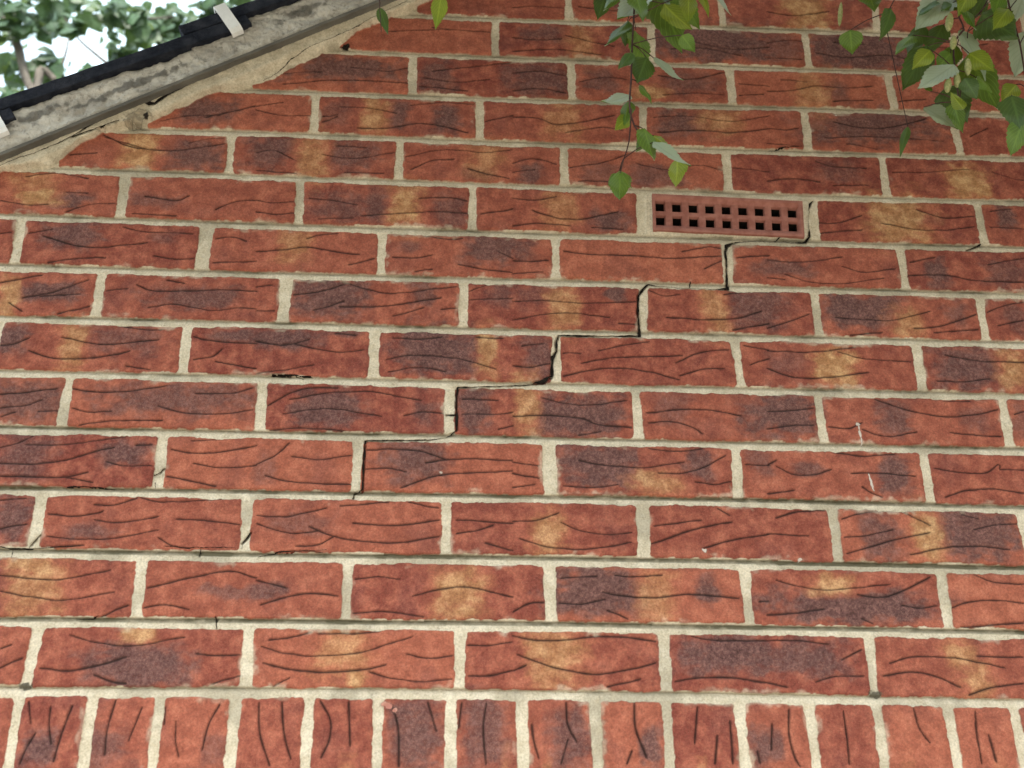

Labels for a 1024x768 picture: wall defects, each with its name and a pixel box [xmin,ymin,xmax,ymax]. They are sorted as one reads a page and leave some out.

crack [263,1,406,81]
crack [353,201,813,498]